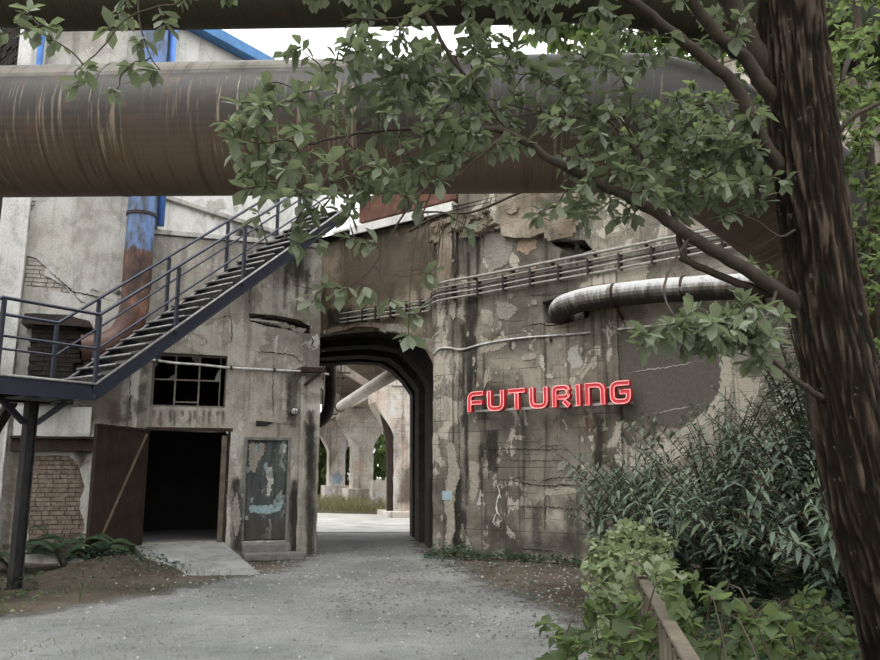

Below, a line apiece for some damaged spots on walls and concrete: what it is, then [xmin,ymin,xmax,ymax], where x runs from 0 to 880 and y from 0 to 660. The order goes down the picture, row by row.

spalling [24,256,70,293]
crack [48,269,108,304]
peeling [482,231,537,277]
leakage [288,375,297,425]
leakage [446,227,480,554]
spalling [28,455,85,555]
peeling [226,430,283,539]
leakage [289,410,316,556]
leakage [479,429,498,489]